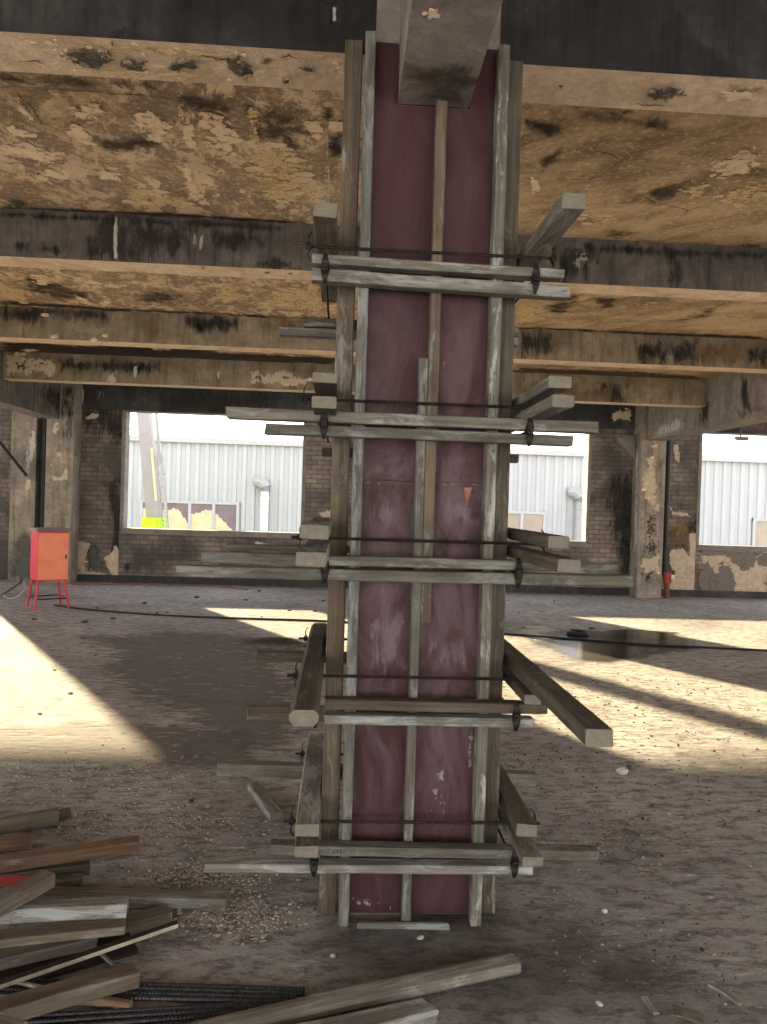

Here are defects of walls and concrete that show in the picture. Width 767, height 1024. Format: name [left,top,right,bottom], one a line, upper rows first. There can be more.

peeling [0,101,72,182]
peeling [66,102,106,146]
peeling [93,164,211,208]
peeling [129,107,320,204]
peeling [302,120,343,140]
peeling [678,145,767,208]
leakage [111,217,177,259]
peeling [4,349,59,377]
peeling [250,369,312,387]
peeling [612,408,632,423]
peeling [641,444,690,517]
peeling [640,553,661,574]